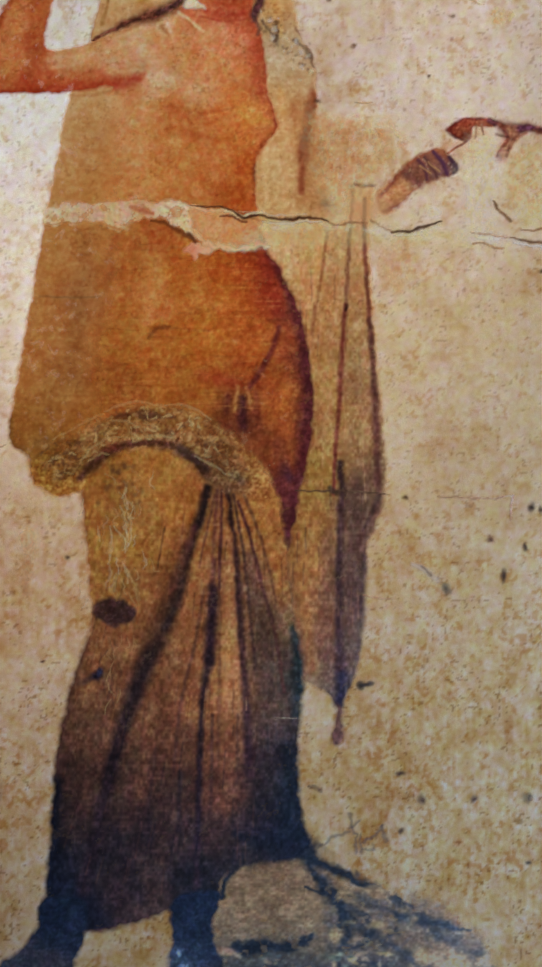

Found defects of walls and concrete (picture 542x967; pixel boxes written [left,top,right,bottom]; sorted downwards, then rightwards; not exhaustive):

flaking render [44,197,271,258]
crack [192,205,329,223]
crack [391,221,442,233]
crack [473,200,542,249]